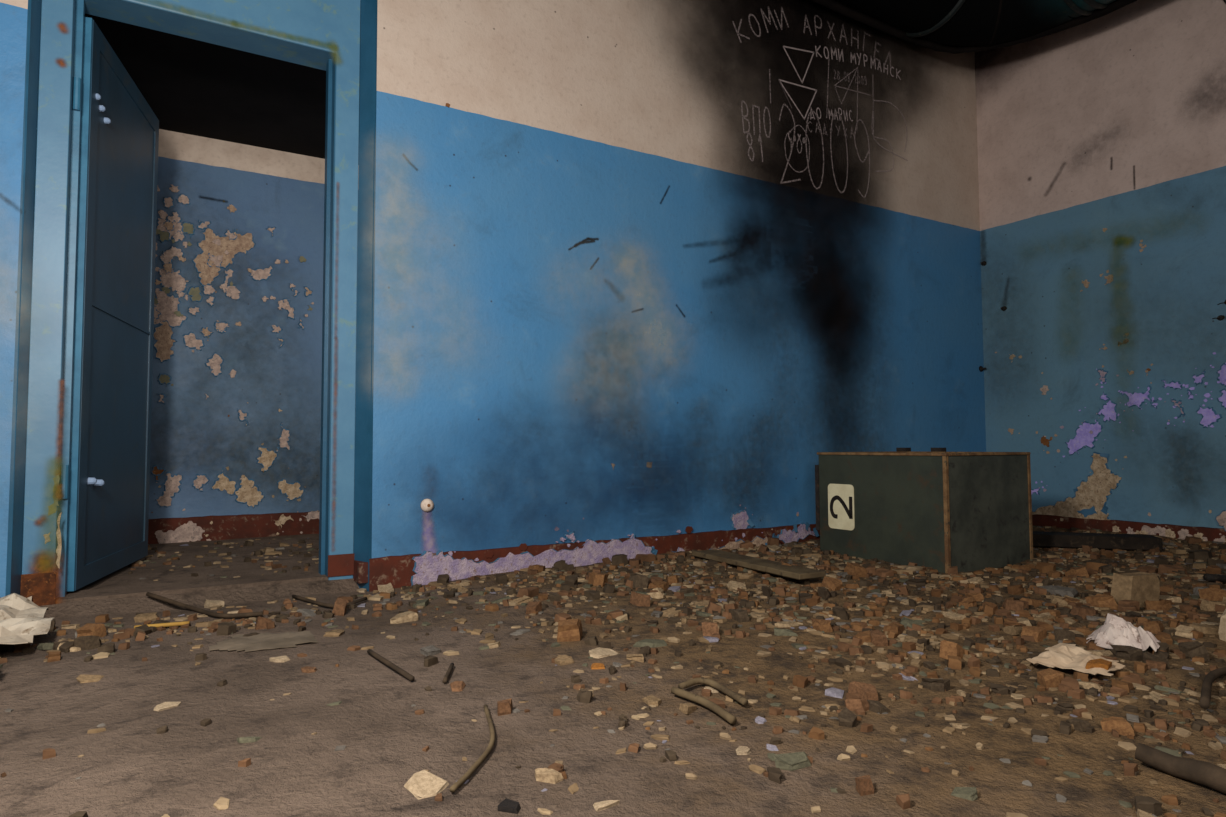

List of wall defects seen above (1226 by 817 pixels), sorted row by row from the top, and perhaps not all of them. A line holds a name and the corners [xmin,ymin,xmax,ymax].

peeling [153,185,306,404]
peeling [262,283,314,348]
peeling [151,409,319,544]
peeling [411,526,693,586]
peeling [709,504,819,550]
peeling [1031,352,1226,542]